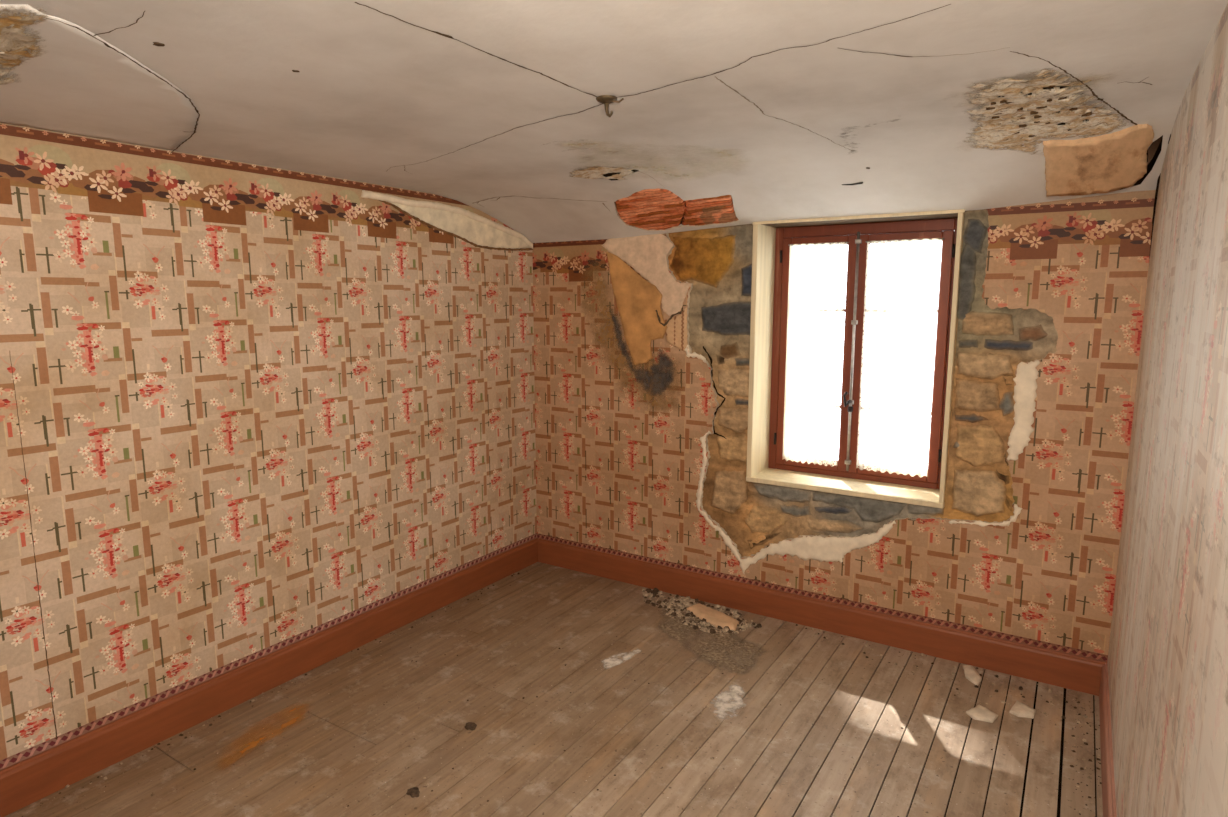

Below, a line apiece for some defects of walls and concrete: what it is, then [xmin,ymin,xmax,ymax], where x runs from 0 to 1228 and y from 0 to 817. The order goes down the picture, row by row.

spalling [0,7,45,84]
crack [46,11,200,153]
spalling [570,166,639,181]
crack [355,2,1152,173]
spalling [966,69,1126,154]
water stain [586,270,678,410]
flaking render [601,188,1058,558]